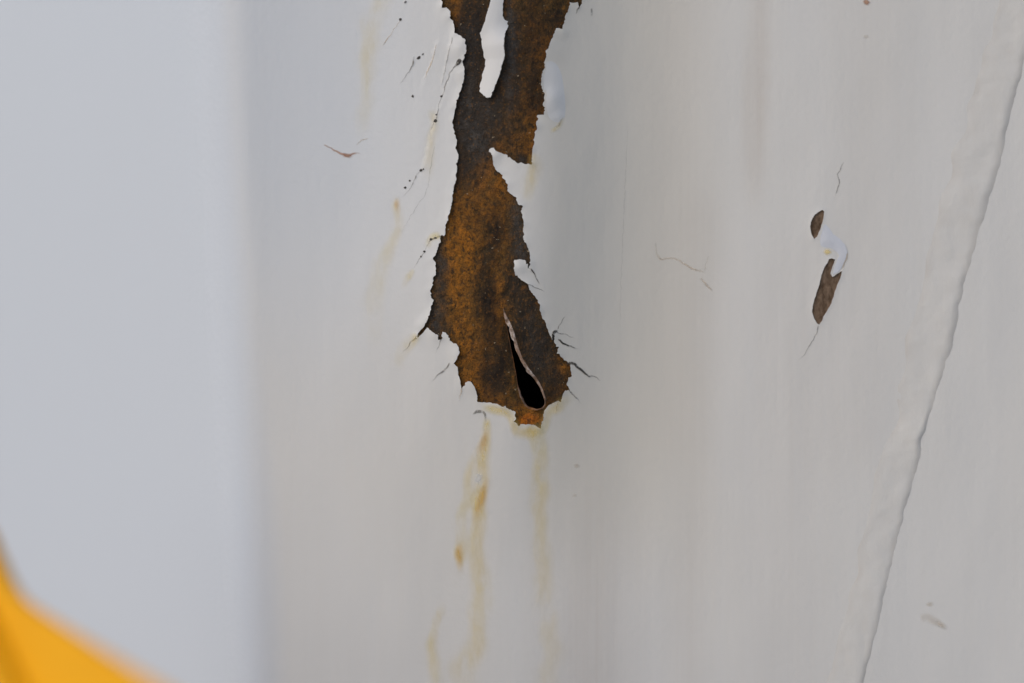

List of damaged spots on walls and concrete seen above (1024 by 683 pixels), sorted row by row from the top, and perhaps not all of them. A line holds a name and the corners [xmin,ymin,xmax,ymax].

corrosion [413,0,595,429]
peeling [809,210,848,346]